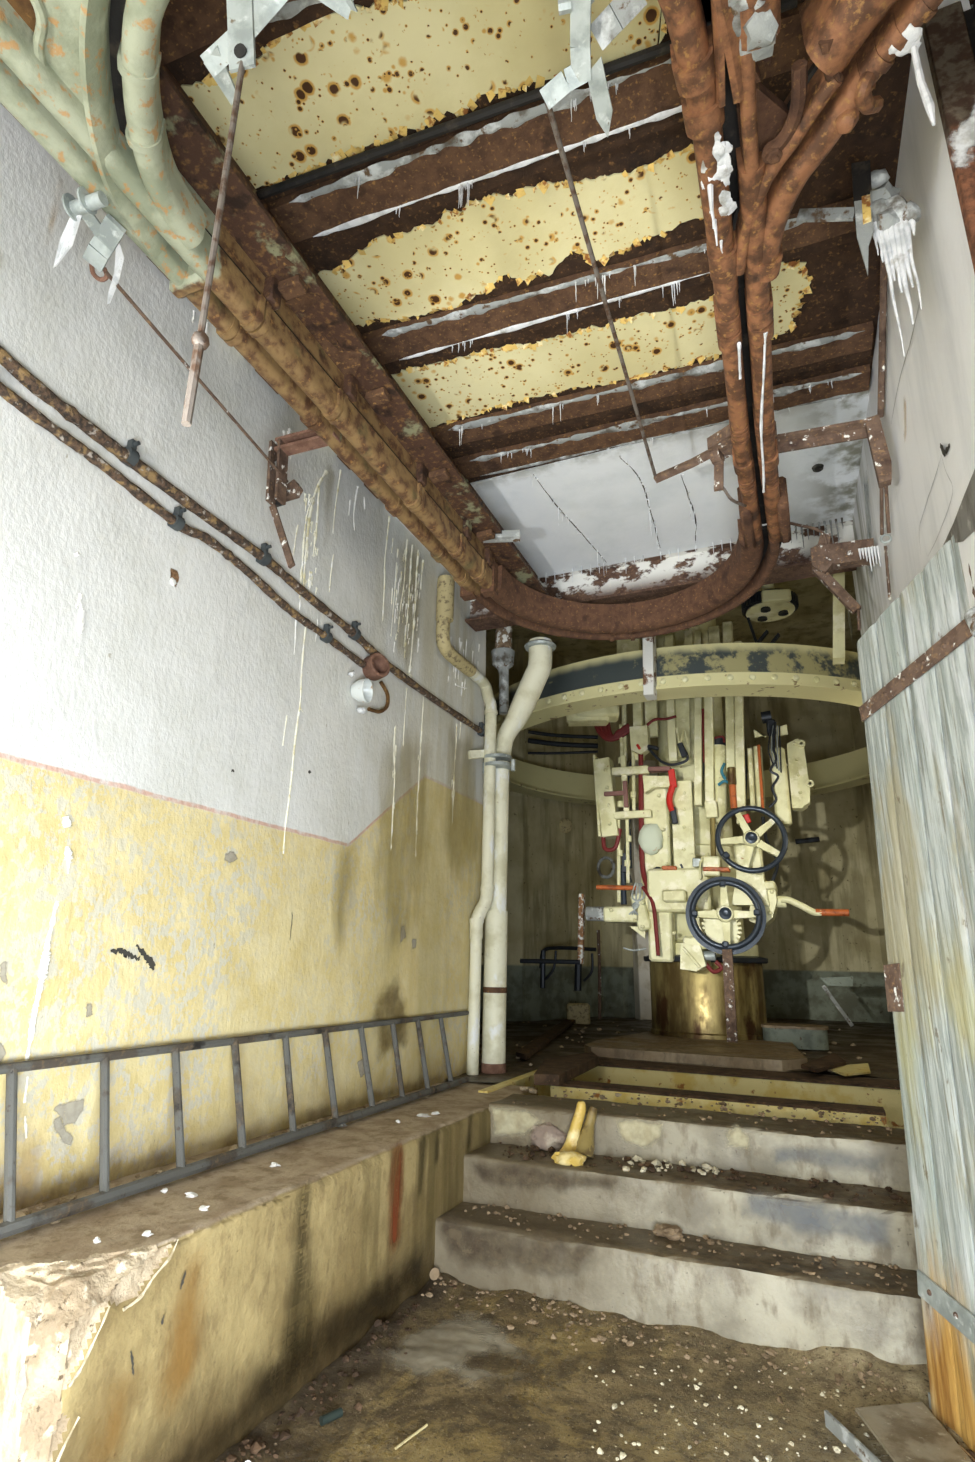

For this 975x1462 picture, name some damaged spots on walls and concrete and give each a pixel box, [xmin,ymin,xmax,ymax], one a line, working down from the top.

damp [282,470,366,854]
damp [382,516,424,856]
damp [451,721,461,823]
rust [391,1144,403,1247]
damp [420,1136,437,1188]
spalling [0,1239,179,1462]
damp [239,1198,421,1421]
damp [392,1316,517,1379]